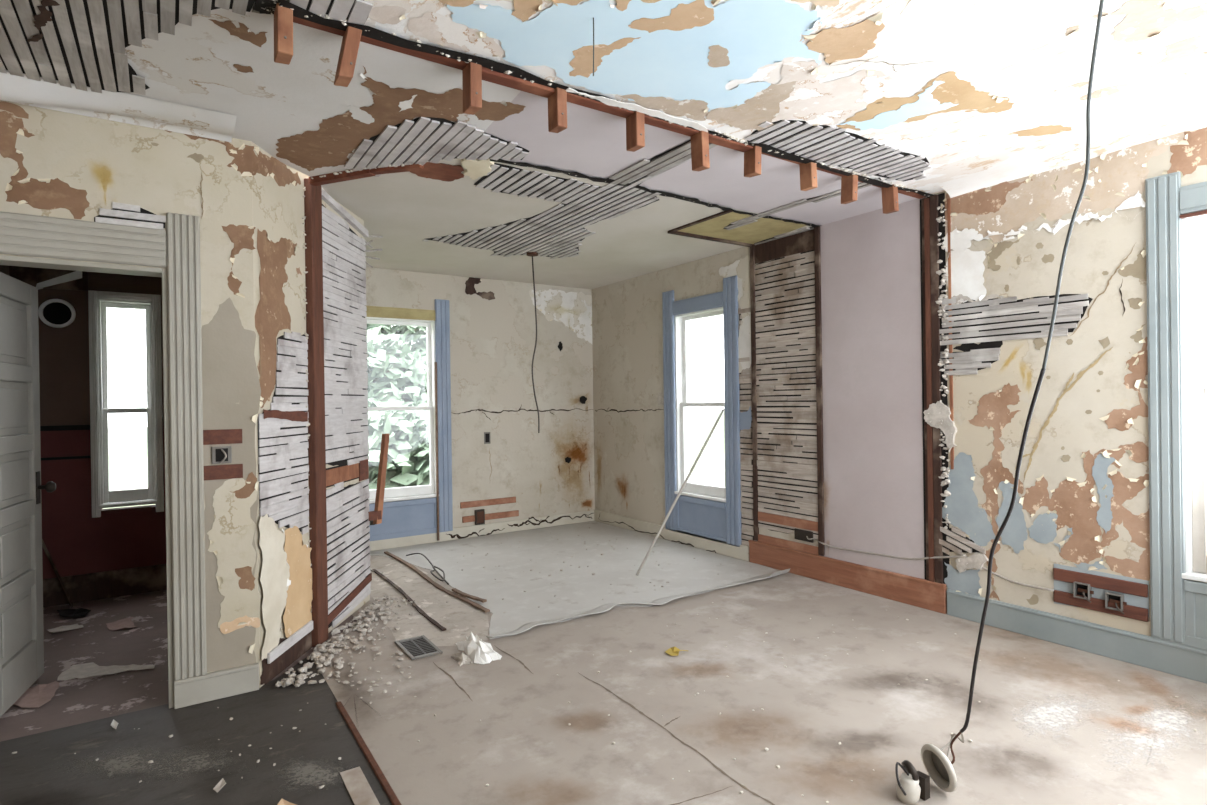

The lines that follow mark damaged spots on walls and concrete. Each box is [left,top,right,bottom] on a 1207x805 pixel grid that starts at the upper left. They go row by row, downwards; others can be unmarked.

spalling [27,0,60,42]
peeling [0,101,90,219]
peeling [208,19,267,47]
peeling [233,64,254,73]
peeling [165,66,526,187]
peeling [369,0,1015,132]
peeling [1065,0,1207,43]
peeling [201,224,313,685]
peeling [940,324,1150,601]
crack [579,673,775,805]